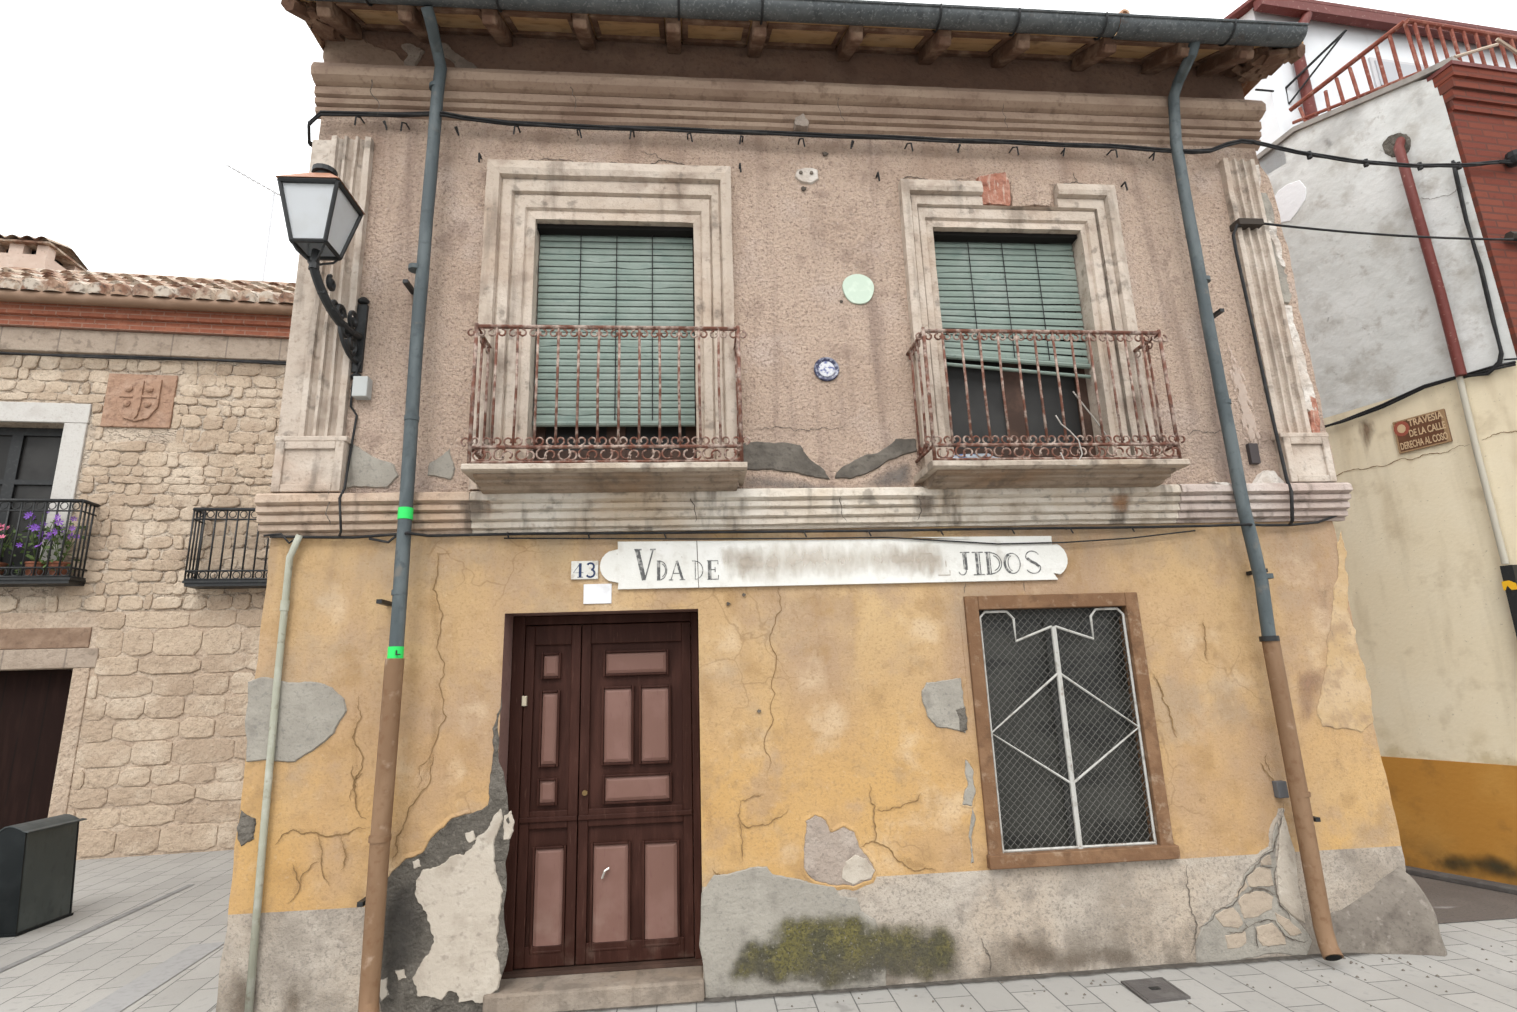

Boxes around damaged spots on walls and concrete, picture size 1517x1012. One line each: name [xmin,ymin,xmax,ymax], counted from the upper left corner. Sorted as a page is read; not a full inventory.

flaking render [976,172,1051,207]
crack [275,553,447,903]
crack [712,588,788,875]
flaking render [956,707,968,732]
flaking render [1317,532,1374,733]
flaking render [379,698,515,1012]
flaking render [799,811,879,891]
crack [1186,865,1198,953]